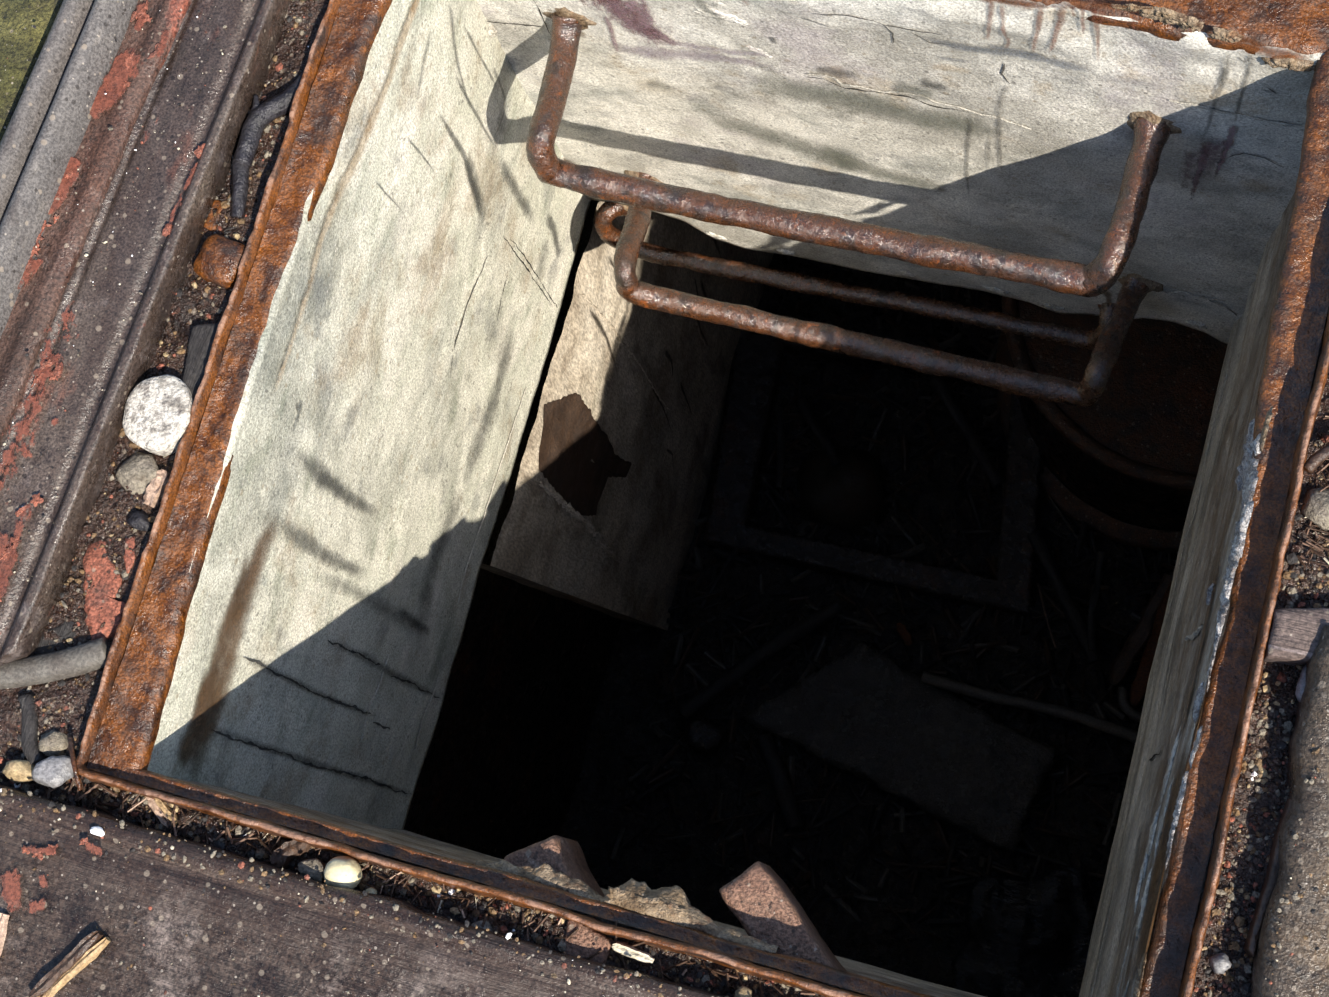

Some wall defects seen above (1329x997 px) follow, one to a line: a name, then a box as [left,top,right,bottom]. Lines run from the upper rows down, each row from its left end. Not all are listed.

peeling [90,0,169,119]
corrosion [581,0,675,47]
crack [811,13,948,45]
crack [806,74,1032,130]
corrosion [984,0,1134,50]
corrosion [1235,36,1303,59]
spalling [539,393,632,516]
peeling [0,493,44,602]
peeling [123,536,135,574]
corrosion [181,530,271,761]
spalling [1116,406,1273,997]
corrosion [1134,570,1219,997]